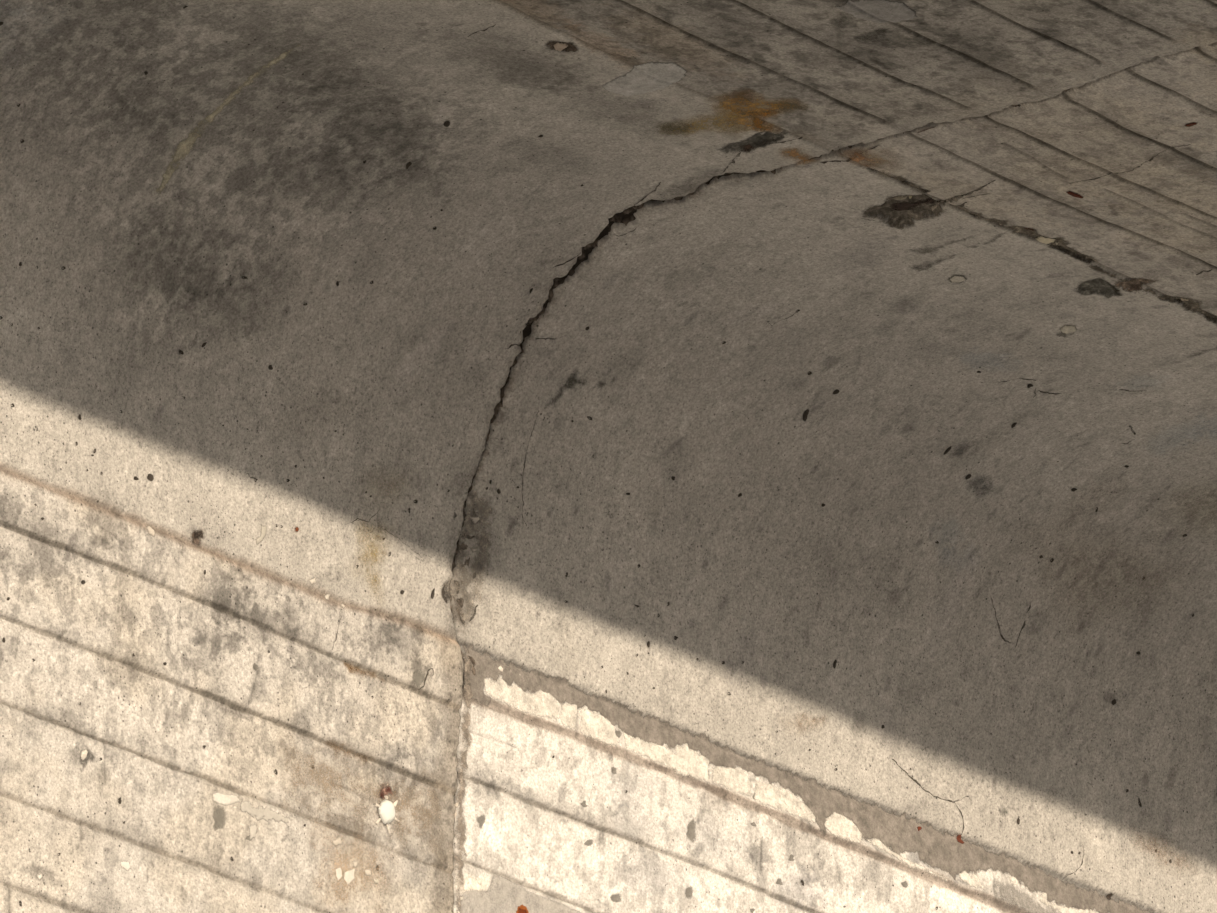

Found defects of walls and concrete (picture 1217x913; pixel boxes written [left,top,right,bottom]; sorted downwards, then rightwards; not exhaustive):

rust [662,92,799,134]
crack [1069,144,1190,184]
crack [945,180,995,207]
spalling [863,168,1217,323]
crack [993,378,1062,398]
crack [442,137,883,706]
crack [991,598,1033,647]
peeling [458,643,1154,913]
crack [892,759,968,835]